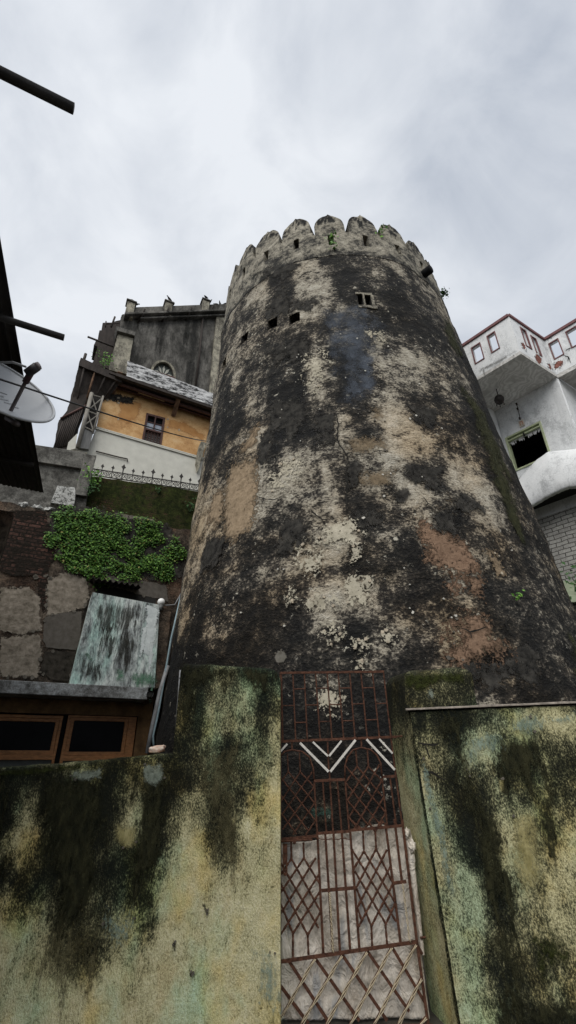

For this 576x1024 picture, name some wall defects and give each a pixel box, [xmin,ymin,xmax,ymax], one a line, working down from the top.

damp [285,333,341,396]
flaking render [206,455,262,547]
damp [257,409,337,501]
damp [382,470,443,493]
damp [81,604,139,684]
damp [273,516,399,671]
flaking render [415,497,518,669]
damp [36,770,107,1014]
damp [130,764,171,906]
damp [437,709,576,1024]